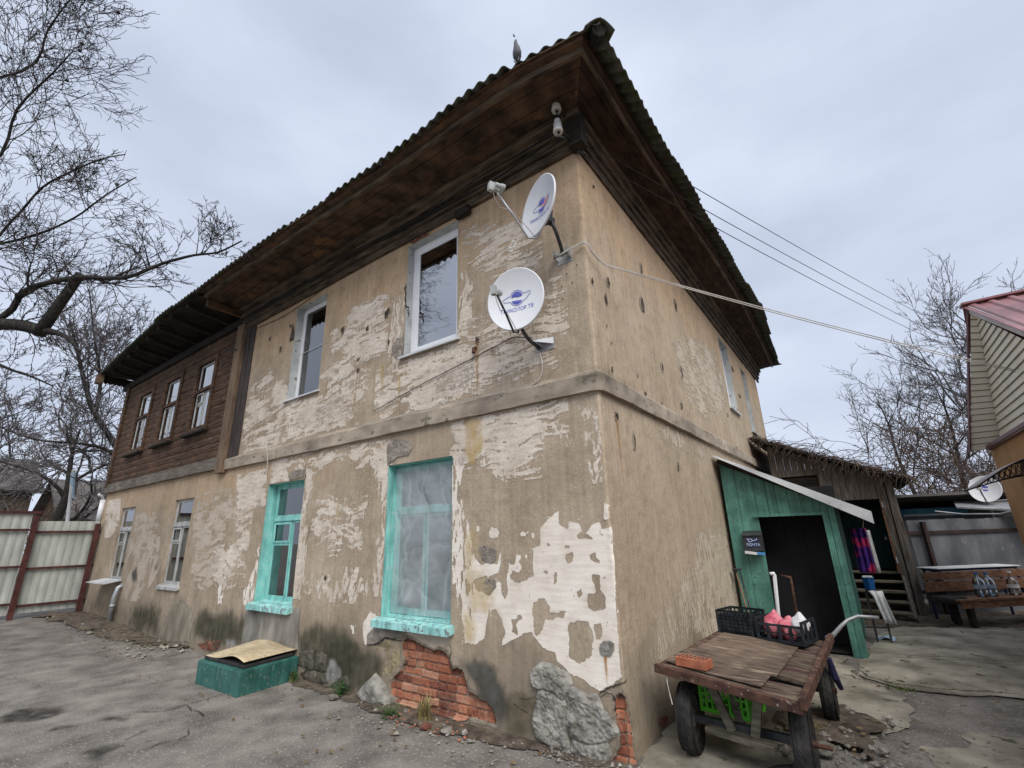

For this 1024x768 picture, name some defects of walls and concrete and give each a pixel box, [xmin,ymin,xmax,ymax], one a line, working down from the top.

flaking render [242,218,577,453]
flaking render [104,498,121,538]
flaking render [123,512,160,602]
flaking render [190,439,412,606]
flaking render [350,395,637,764]